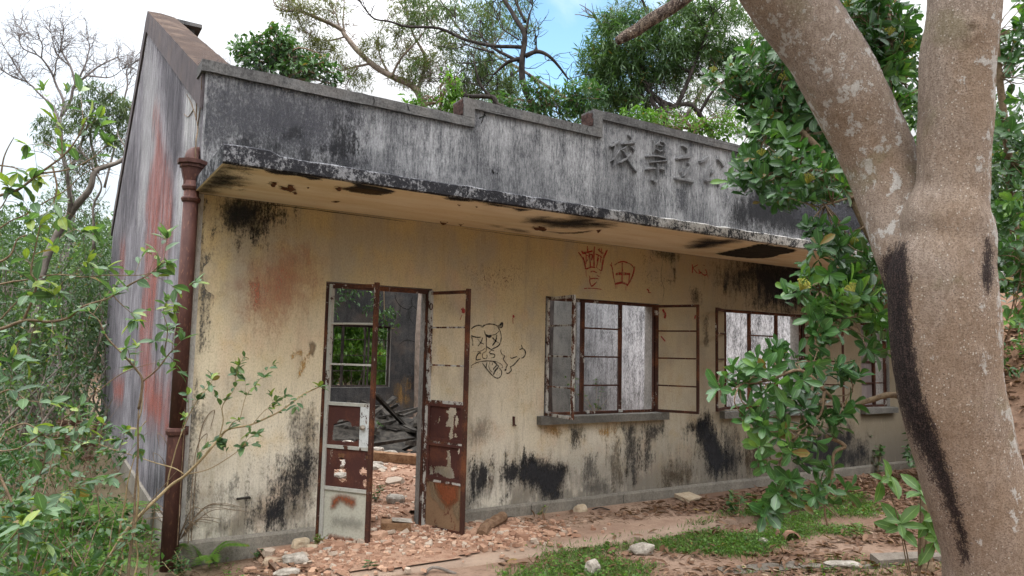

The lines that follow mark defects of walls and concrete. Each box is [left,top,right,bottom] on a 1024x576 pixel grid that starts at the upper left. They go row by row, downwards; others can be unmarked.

damp [160,53,367,226]
spalling [268,182,309,195]
damp [345,183,394,195]
damp [444,197,614,234]
damp [198,166,286,352]
flaking render [718,244,797,259]
damp [266,424,314,525]
damp [467,447,568,505]
damp [570,425,585,447]
damp [584,456,607,493]
damp [599,423,664,485]
damp [692,414,768,479]